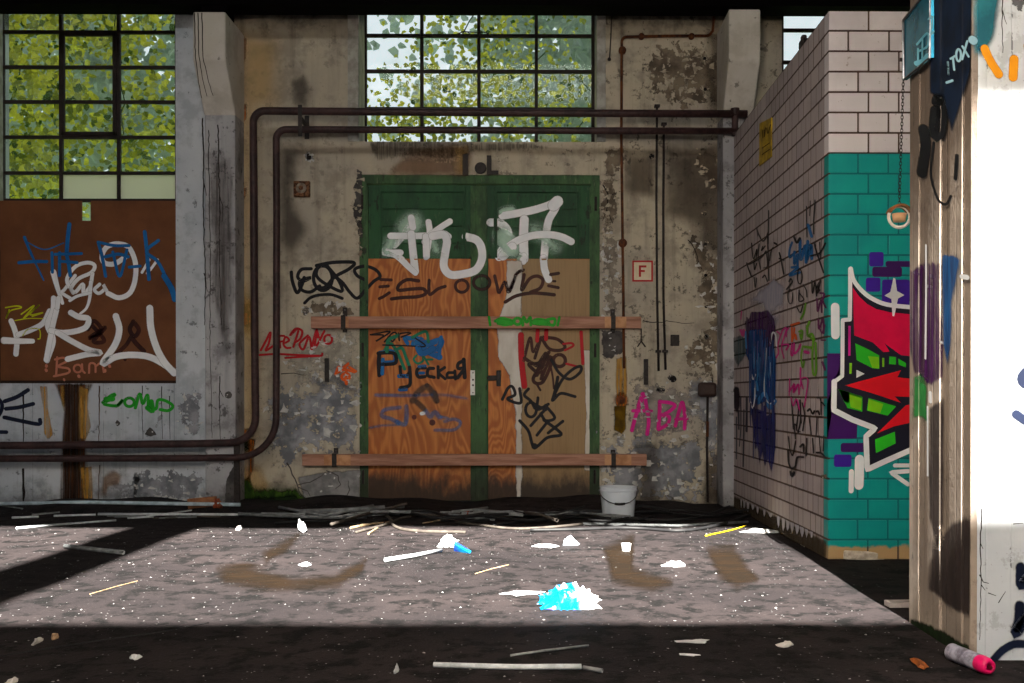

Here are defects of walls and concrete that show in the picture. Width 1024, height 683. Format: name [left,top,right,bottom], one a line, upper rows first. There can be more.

peeling [642,40,717,110]
damp [215,160,232,336]
peeling [301,301,354,316]
corrosion [56,384,120,499]
peeling [259,330,366,467]
peeling [298,470,360,498]
peeling [596,235,717,502]